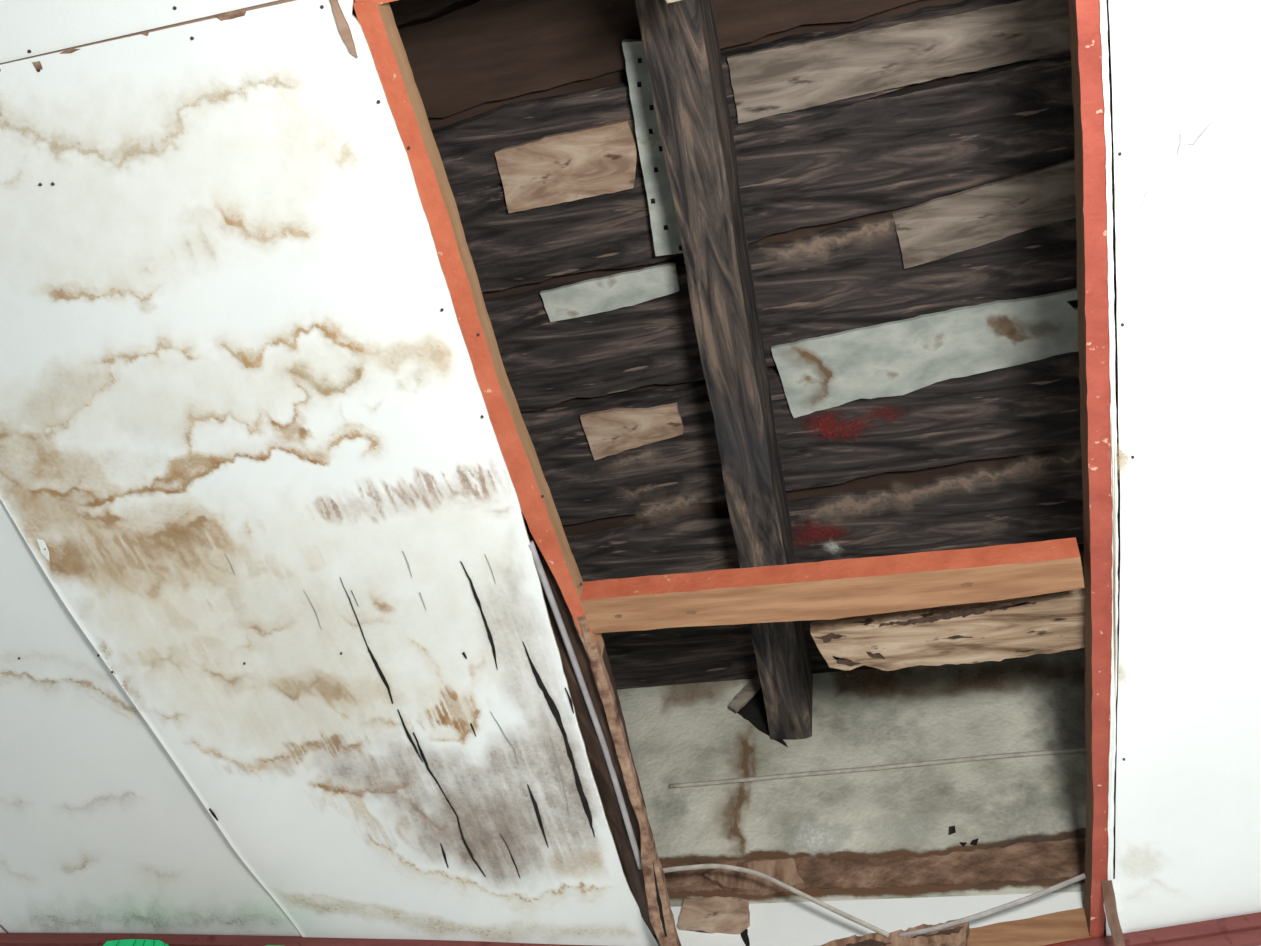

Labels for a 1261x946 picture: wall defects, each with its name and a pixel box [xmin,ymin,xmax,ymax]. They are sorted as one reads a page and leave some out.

crack [1177,121,1213,157]
leakage [30,324,378,576]
leakage [368,466,492,514]
crack [340,577,486,877]
leakage [427,690,479,741]
crack [460,555,595,848]
flaking render [729,674,788,747]
spalling [816,633,885,666]
leakage [257,735,591,877]
crack [500,834,520,878]
flaking render [659,826,1086,934]
peeling [1103,828,1126,937]